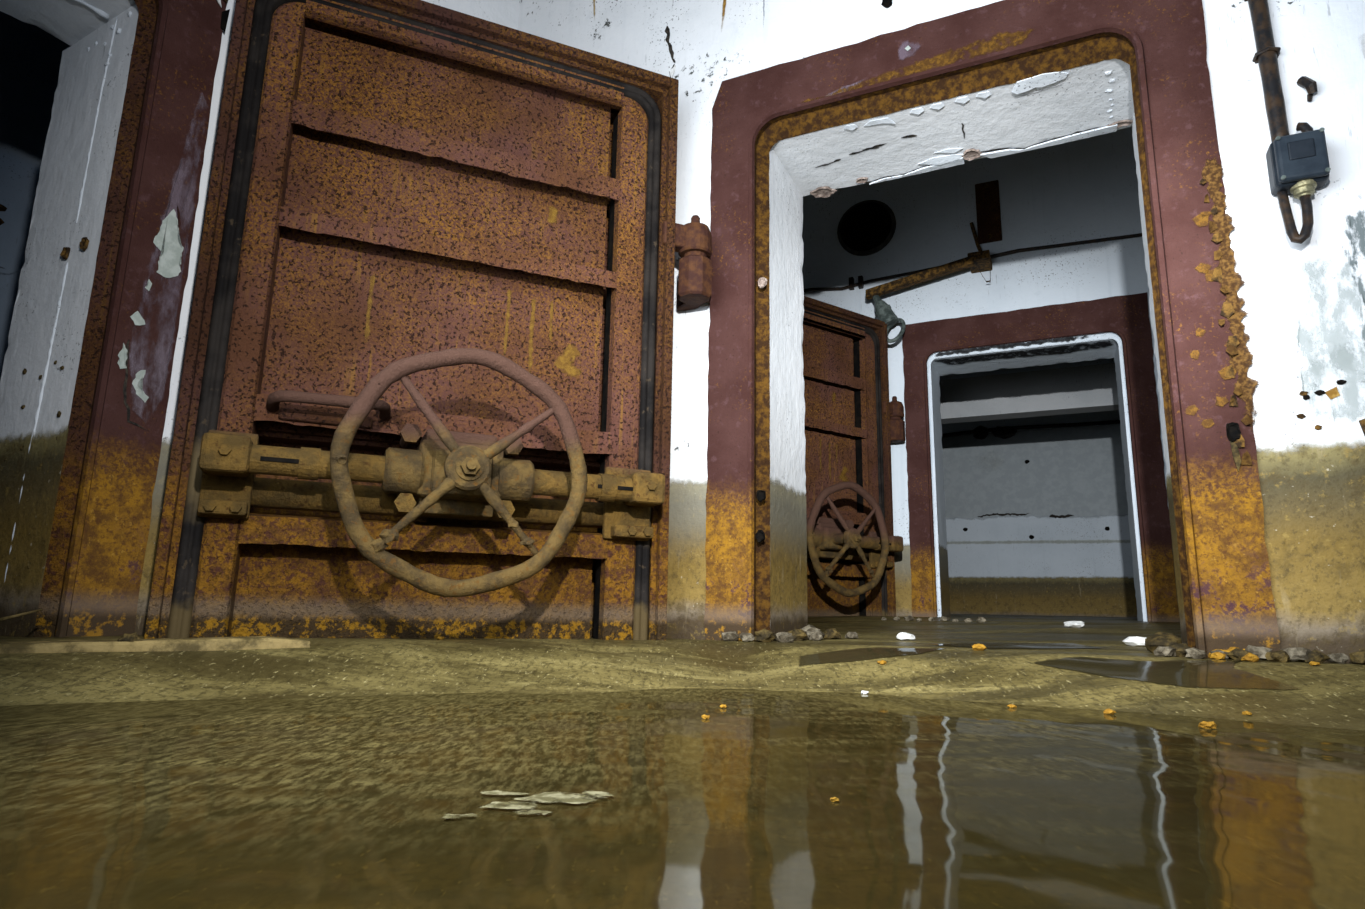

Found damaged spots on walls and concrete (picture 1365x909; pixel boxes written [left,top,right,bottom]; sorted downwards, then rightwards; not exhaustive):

rust [804,29,1033,102]
peeling [118,123,199,429]
rust [866,222,993,300]
rust [1186,157,1259,465]
damp [1296,210,1365,420]
damp [1257,443,1365,664]